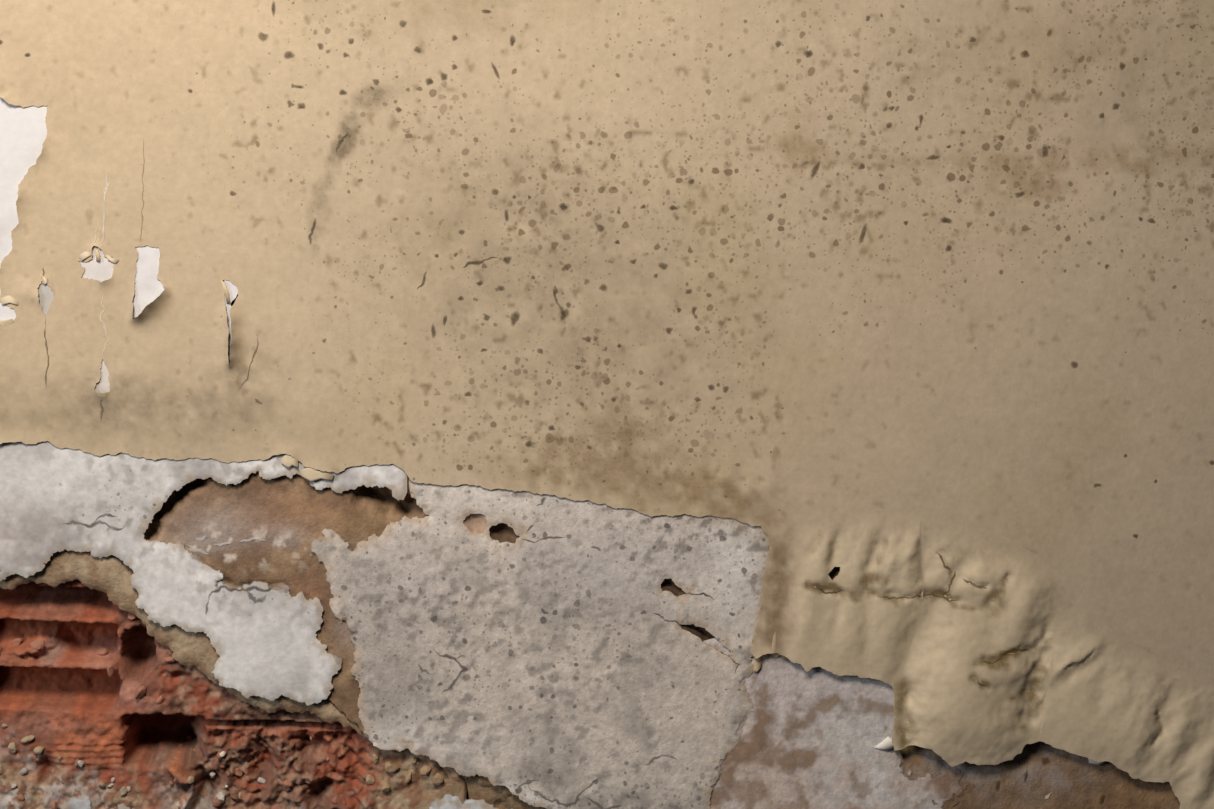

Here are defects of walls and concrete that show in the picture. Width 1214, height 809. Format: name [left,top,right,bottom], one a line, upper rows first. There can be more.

peeling [0,98,47,264]
peeling [0,291,18,327]
peeling [37,276,54,316]
peeling [79,246,119,283]
peeling [132,245,166,319]
peeling [221,280,238,360]
peeling [94,359,110,395]
flaking render [0,441,1180,809]